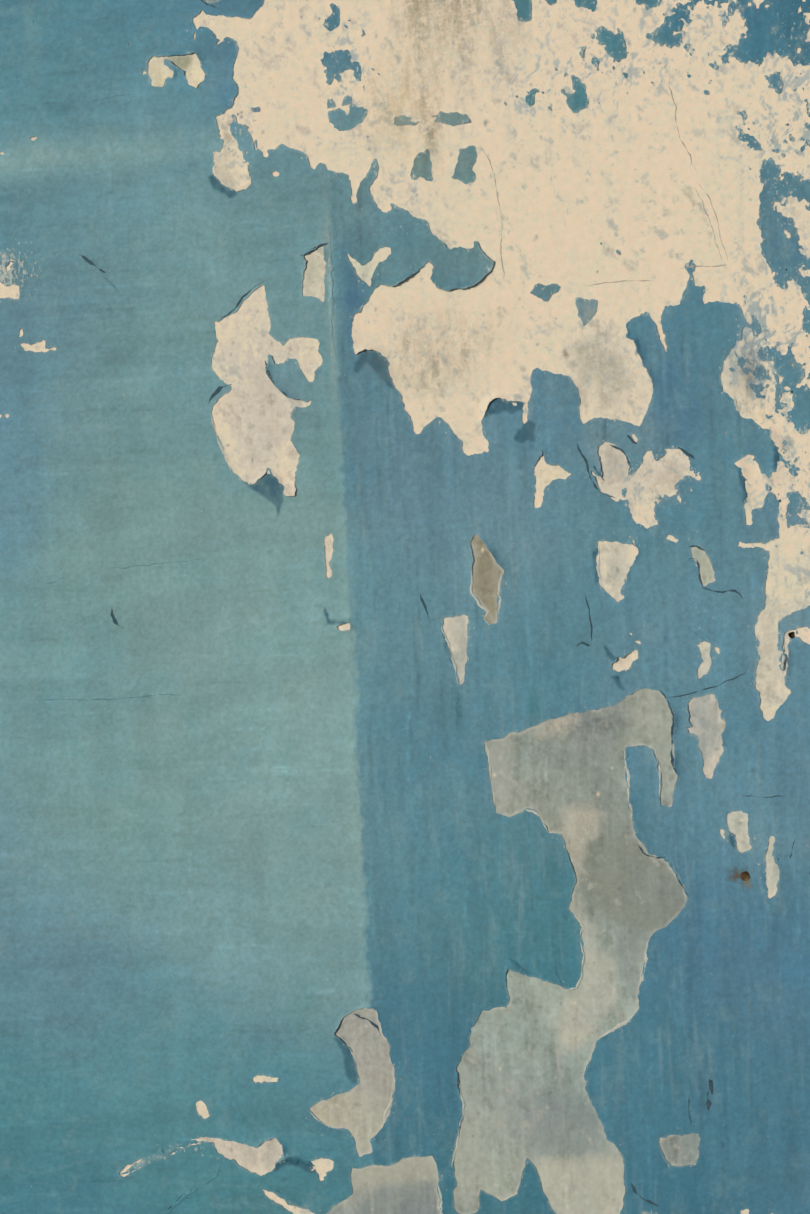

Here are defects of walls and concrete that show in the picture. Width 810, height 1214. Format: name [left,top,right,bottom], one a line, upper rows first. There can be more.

peeling [0,253,20,299]
peeling [142,0,810,721]
peeling [172,688,725,1214]